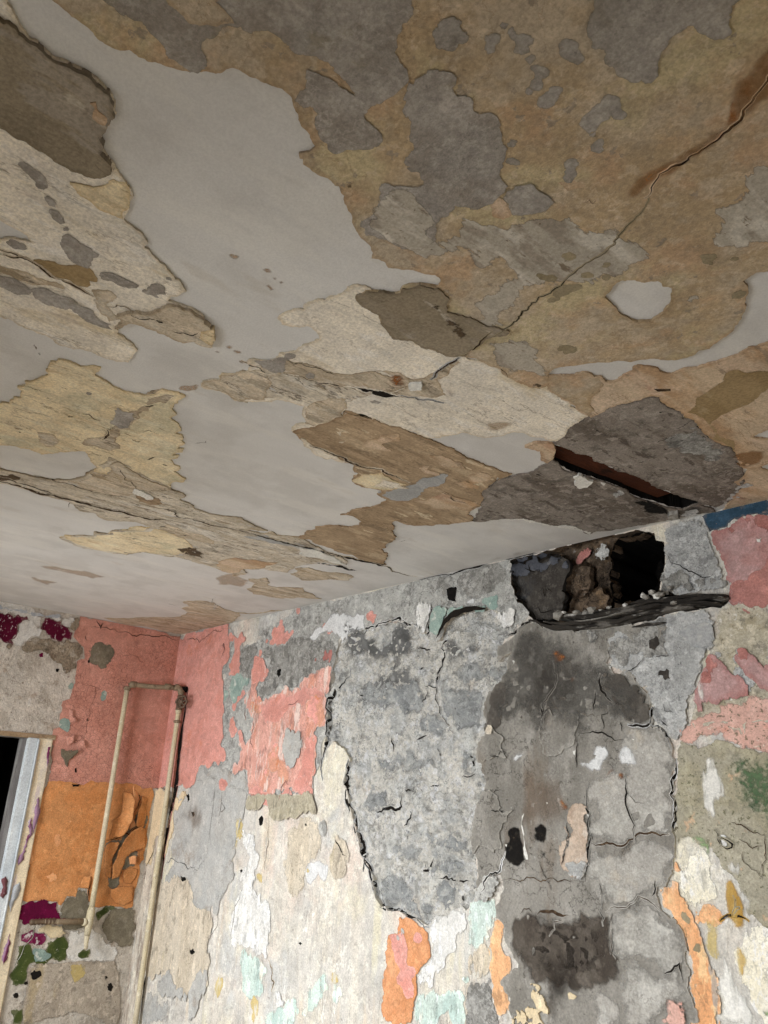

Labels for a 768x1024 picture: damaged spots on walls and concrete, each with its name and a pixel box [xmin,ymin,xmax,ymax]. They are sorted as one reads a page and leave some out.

corrosion [731,53,768,118]
peeling [0,0,768,581]
crack [241,75,768,420]
crack [320,666,430,928]
flaking render [0,500,768,1024]
crack [349,606,486,735]
crack [508,619,571,636]
crack [475,673,684,963]
damp [582,746,636,770]